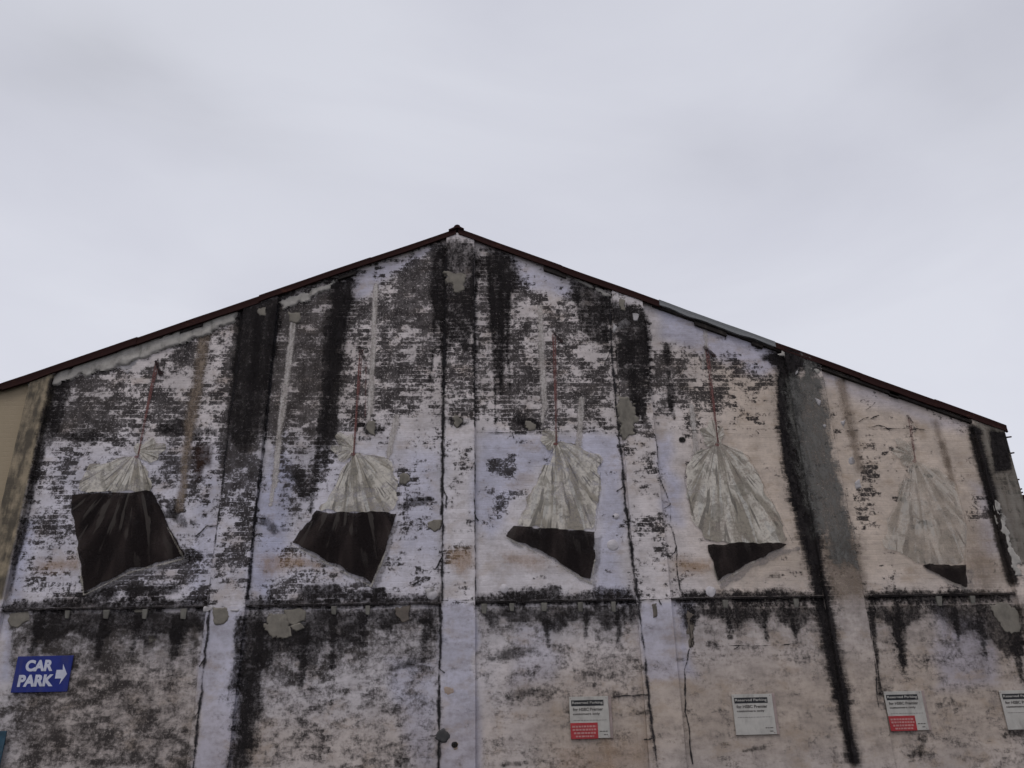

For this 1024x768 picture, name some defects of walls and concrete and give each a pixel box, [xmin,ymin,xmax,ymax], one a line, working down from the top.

water stain [157,299,296,507]
water stain [292,278,358,513]
water stain [428,239,520,457]
water stain [569,278,676,424]
peeling [612,313,640,333]
water stain [1,584,209,669]
mould [488,648,531,661]
water stain [475,585,639,648]
crack [684,625,790,764]
water stain [676,349,860,766]
water stain [867,425,1024,695]